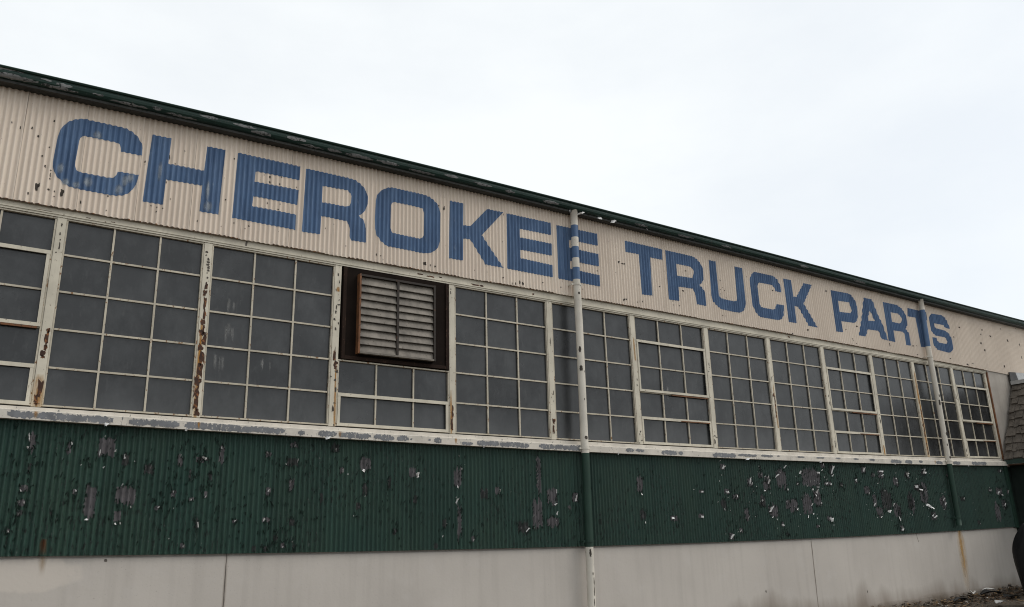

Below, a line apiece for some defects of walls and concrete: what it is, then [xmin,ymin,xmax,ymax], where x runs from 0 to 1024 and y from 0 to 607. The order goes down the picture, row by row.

corrosion [40,328,50,358]
corrosion [193,282,208,427]
corrosion [33,379,44,414]
peeling [7,410,135,468]
peeling [129,418,285,434]
peeling [318,424,412,441]
peeling [72,483,97,521]
peeling [113,484,136,525]
peeling [446,455,475,542]
peeling [477,436,588,534]
peeling [713,452,841,540]
peeling [854,449,969,531]